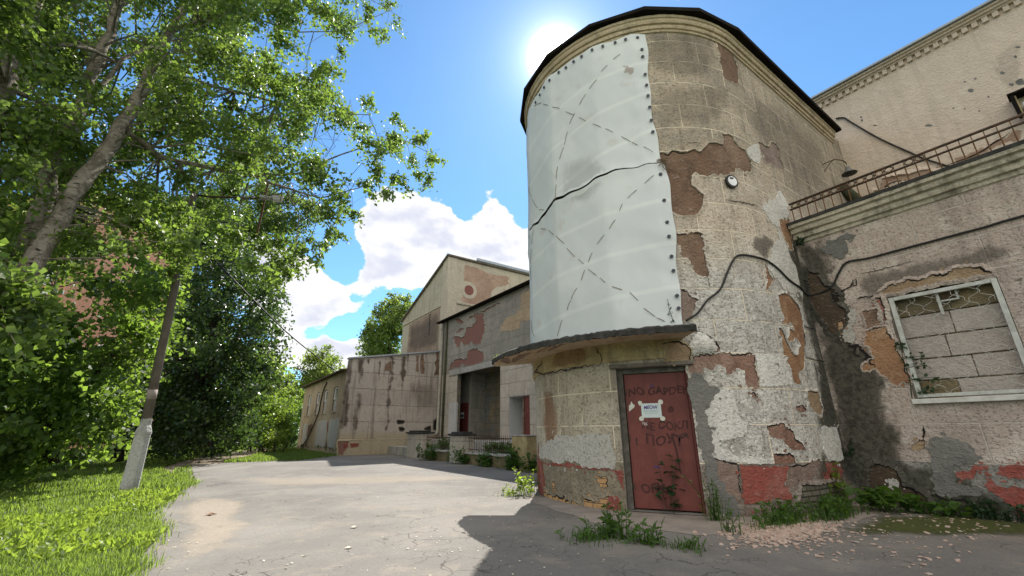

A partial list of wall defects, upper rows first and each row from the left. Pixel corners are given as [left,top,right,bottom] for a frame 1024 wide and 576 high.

spalling [715,42,740,86]
spalling [652,132,784,324]
water stain [340,355,409,429]
spalling [415,265,509,376]
spalling [661,188,998,514]
water stain [789,242,1008,513]
peeling [537,422,624,511]
peeling [956,459,1024,516]